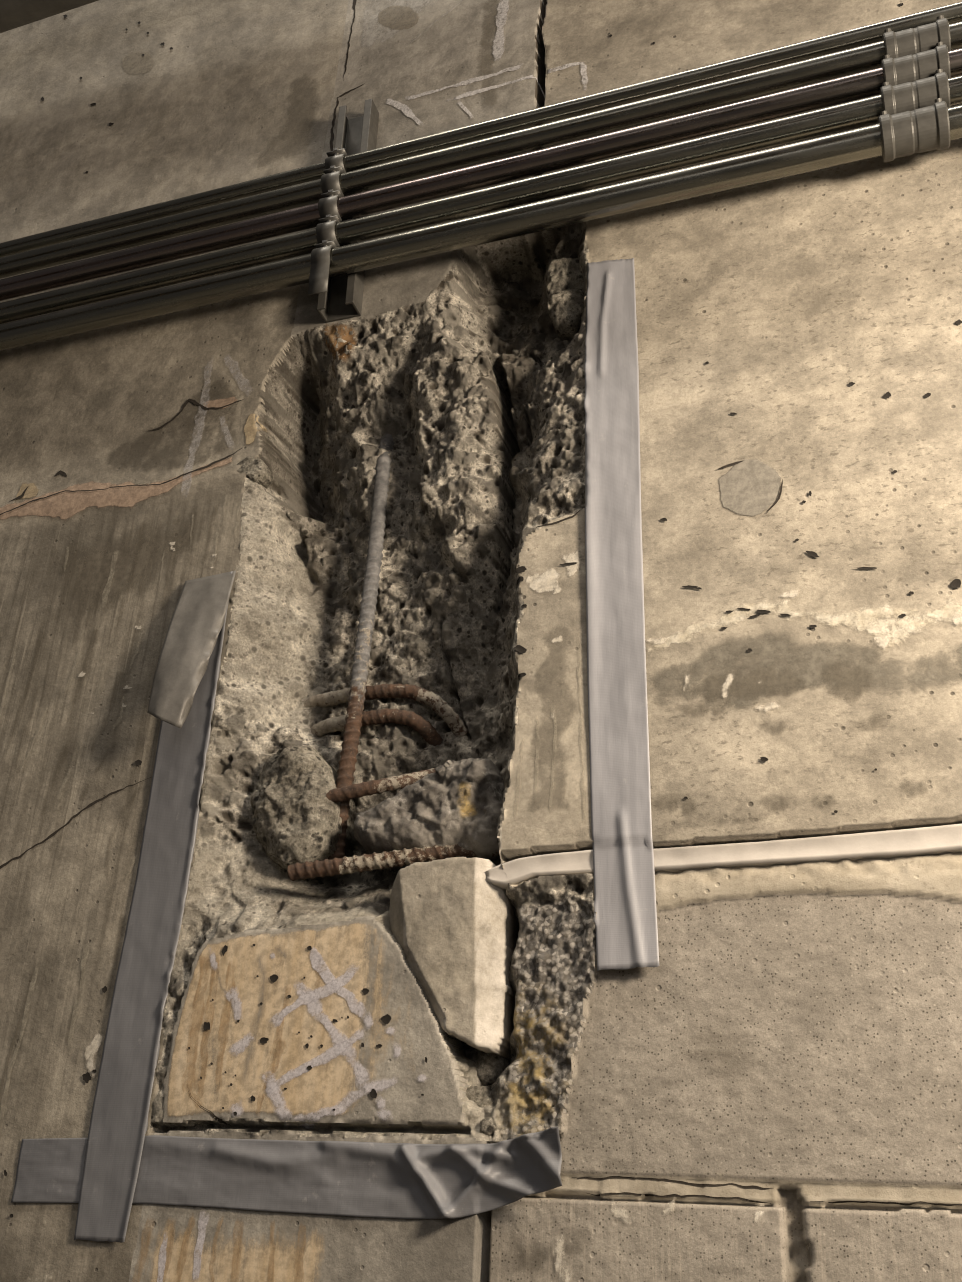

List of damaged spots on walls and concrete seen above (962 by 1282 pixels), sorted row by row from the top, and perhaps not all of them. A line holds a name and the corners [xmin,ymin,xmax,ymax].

crack [535,0,547,108]
spalling [0,222,597,1143]
damp [647,590,962,731]
crack [0,777,151,869]
crack [572,1176,771,1204]
crack [810,1199,962,1207]